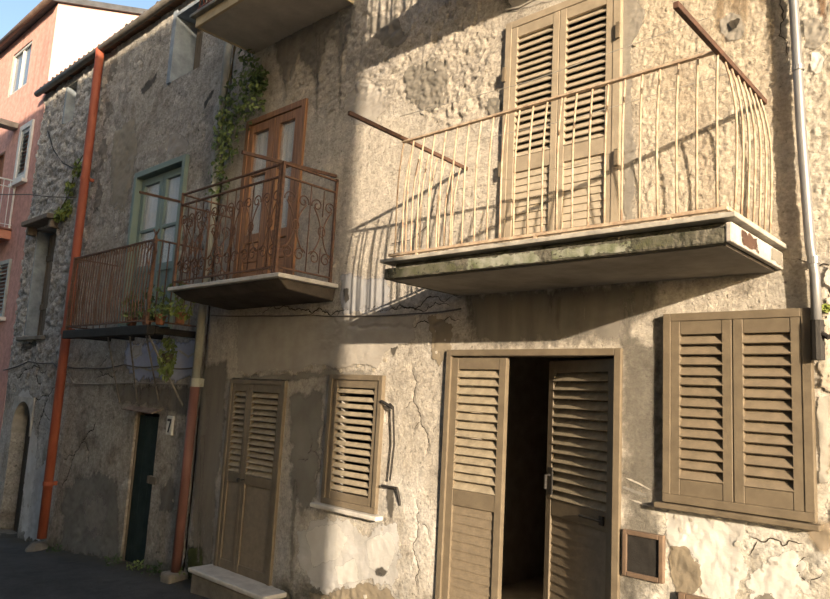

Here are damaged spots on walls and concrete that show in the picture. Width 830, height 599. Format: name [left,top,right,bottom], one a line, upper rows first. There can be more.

flaking render [505,0,552,11]
corrosion [742,230,759,253]
flaking render [236,310,416,376]
crack [263,295,460,328]
flaking render [426,315,453,366]
crack [406,370,429,451]
peeling [297,516,402,599]
crack [413,499,429,585]
peeling [662,510,811,599]